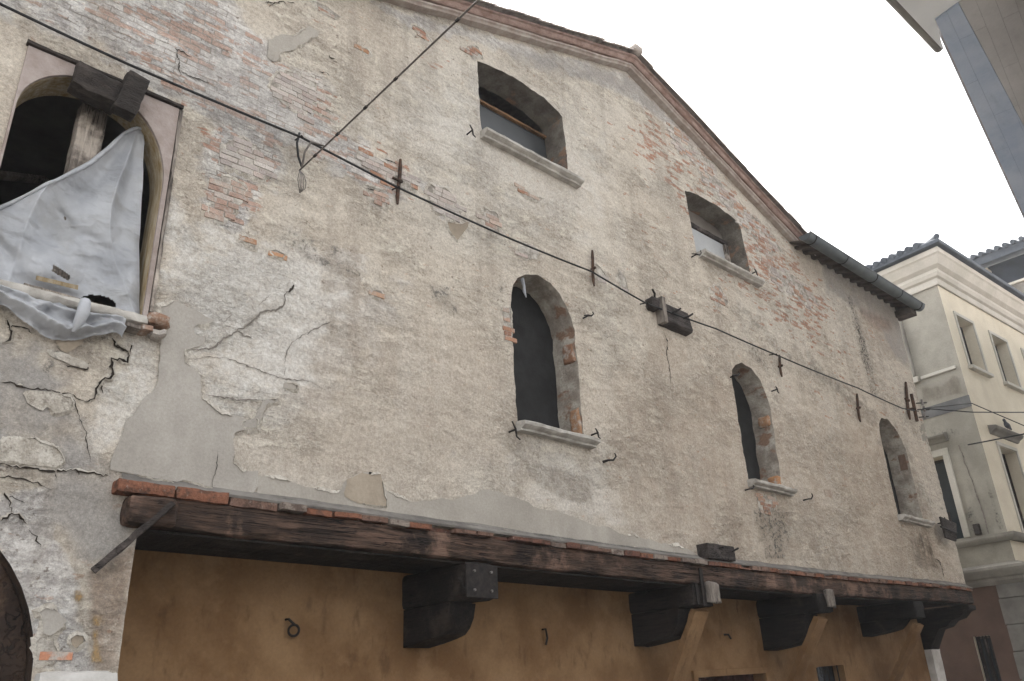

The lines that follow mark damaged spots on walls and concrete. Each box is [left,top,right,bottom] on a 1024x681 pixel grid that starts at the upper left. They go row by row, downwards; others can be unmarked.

flaking render [201,135,287,262]
flaking render [355,146,502,242]
flaking render [666,121,784,268]
crack [3,319,31,344]
crack [193,285,330,390]
crack [0,338,133,545]
spalling [110,299,695,555]